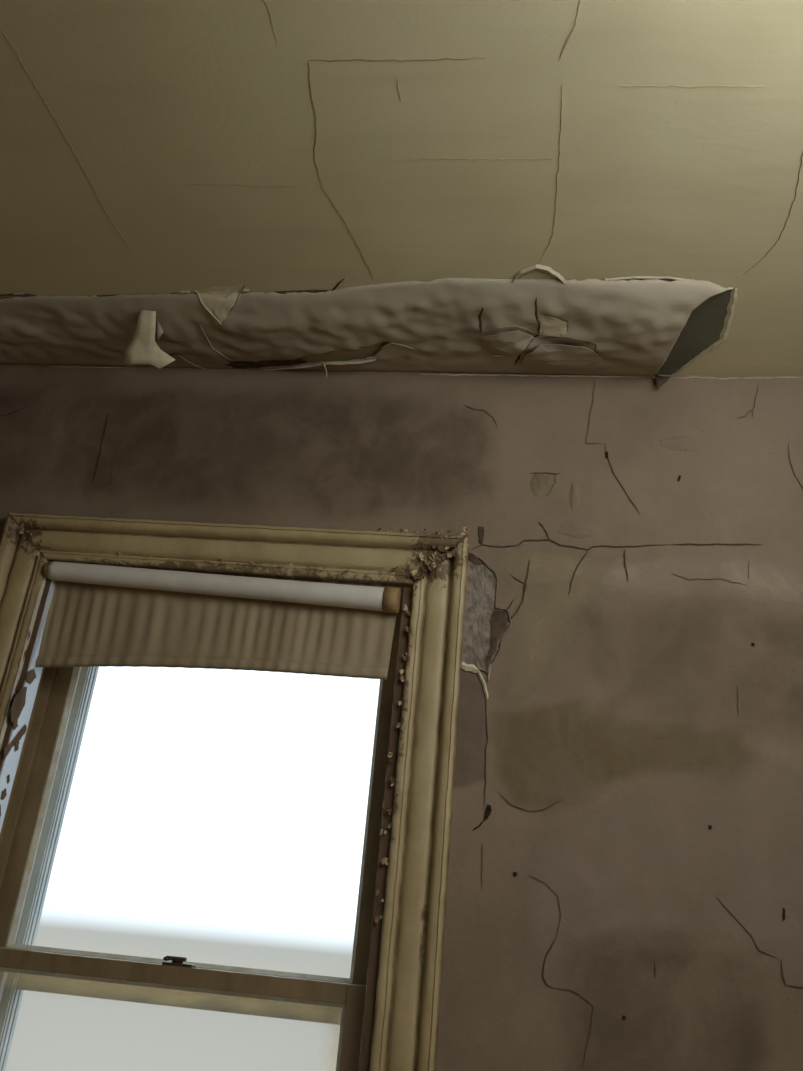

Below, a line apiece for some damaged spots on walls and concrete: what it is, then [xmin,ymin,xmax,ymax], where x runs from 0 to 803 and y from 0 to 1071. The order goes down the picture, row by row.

crack [559,0,581,60]
peeling [195,285,245,325]
crack [308,58,485,278]
peeling [512,264,565,284]
peeling [478,298,602,369]
crack [539,87,562,263]
crack [746,152,803,273]
crack [586,383,641,515]
peeling [0,576,47,760]
flaking render [377,526,512,699]
leakage [515,554,589,693]
crack [409,522,763,622]